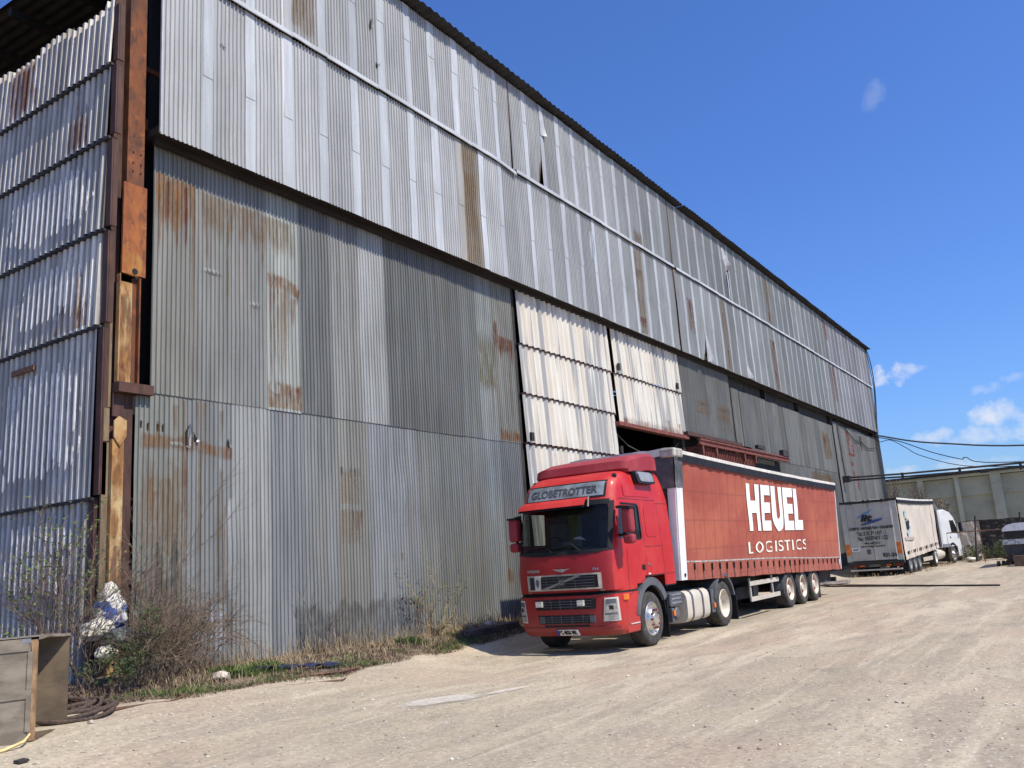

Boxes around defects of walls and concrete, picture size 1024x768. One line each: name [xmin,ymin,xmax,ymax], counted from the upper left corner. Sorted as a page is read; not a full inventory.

rust [10,65,36,119]
rust [156,172,196,243]
rust [127,254,142,275]